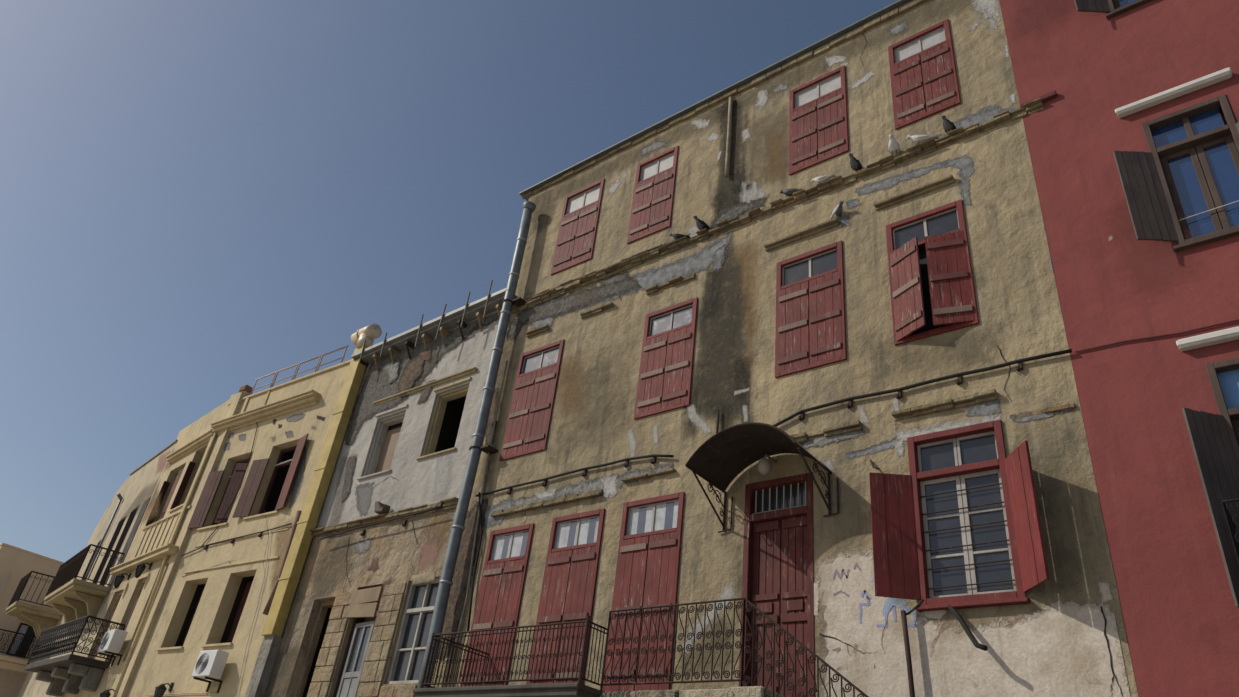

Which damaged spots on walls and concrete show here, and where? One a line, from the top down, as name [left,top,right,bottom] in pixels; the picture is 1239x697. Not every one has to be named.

leakage [715,100,788,226]
spalling [838,153,974,227]
leakage [382,358,401,385]
spalling [341,193,770,503]
leakage [685,243,750,433]
spalling [367,558,391,627]
spalling [410,571,435,584]
spalling [437,461,674,660]
peeling [814,548,1130,697]
crack [1101,606,1123,697]